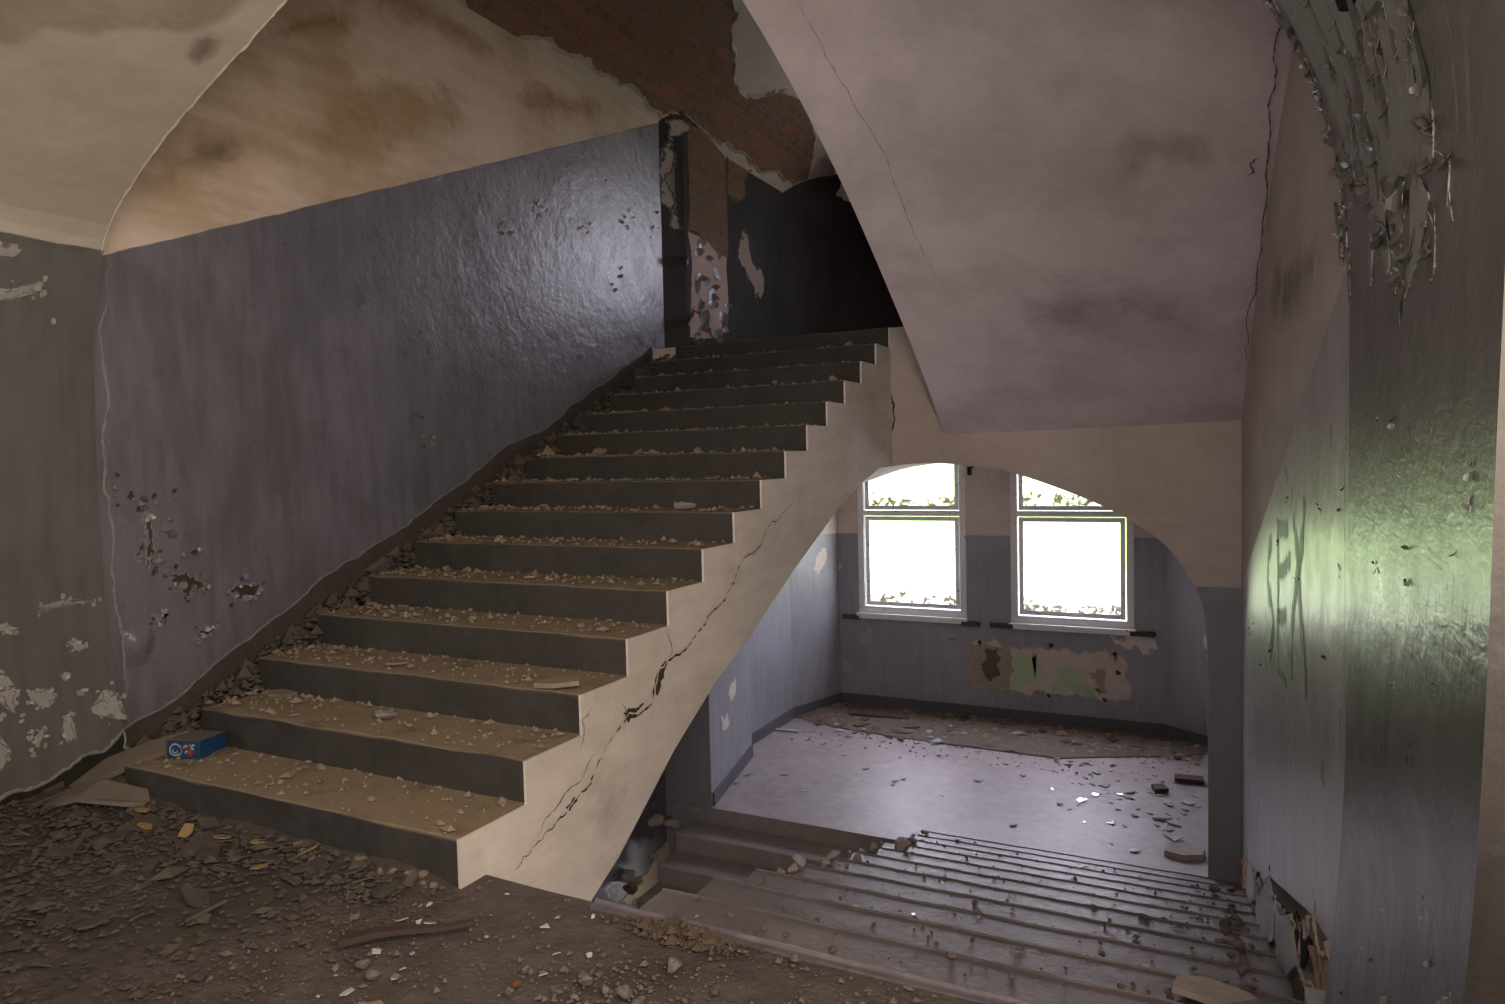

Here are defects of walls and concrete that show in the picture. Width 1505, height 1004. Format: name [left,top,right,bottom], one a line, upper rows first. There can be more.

flaking render [461,0,816,345]
crack [1245,26,1281,373]
peeling [1262,0,1454,326]
spalling [0,0,653,810]
crack [516,503,791,869]
spalling [1171,975,1257,1004]
spalling [1239,846,1344,1001]